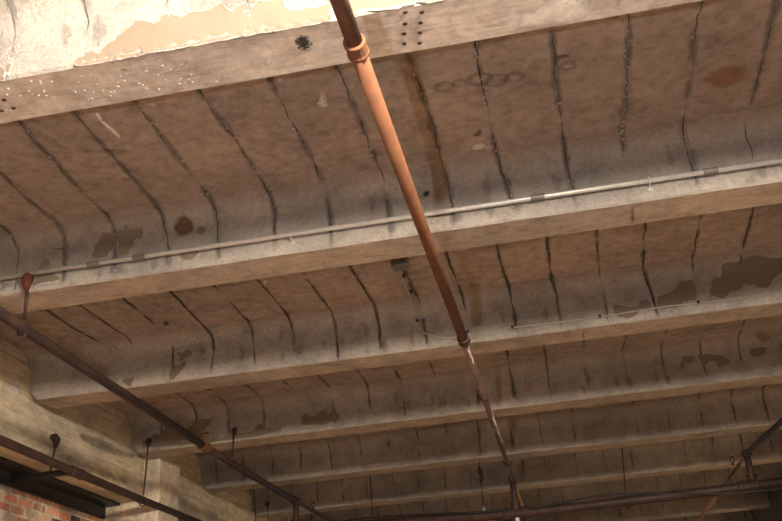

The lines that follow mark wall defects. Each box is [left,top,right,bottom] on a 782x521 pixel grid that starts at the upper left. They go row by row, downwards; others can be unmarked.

peeling [349,0,446,16]
peeling [74,0,333,66]
crack [619,14,632,154]
crack [71,111,103,145]
crack [474,41,516,220]
crack [116,161,169,259]
peeling [90,224,146,260]
crack [546,237,558,302]
peeling [710,255,782,298]
peeling [613,280,697,318]
peeling [169,349,192,380]